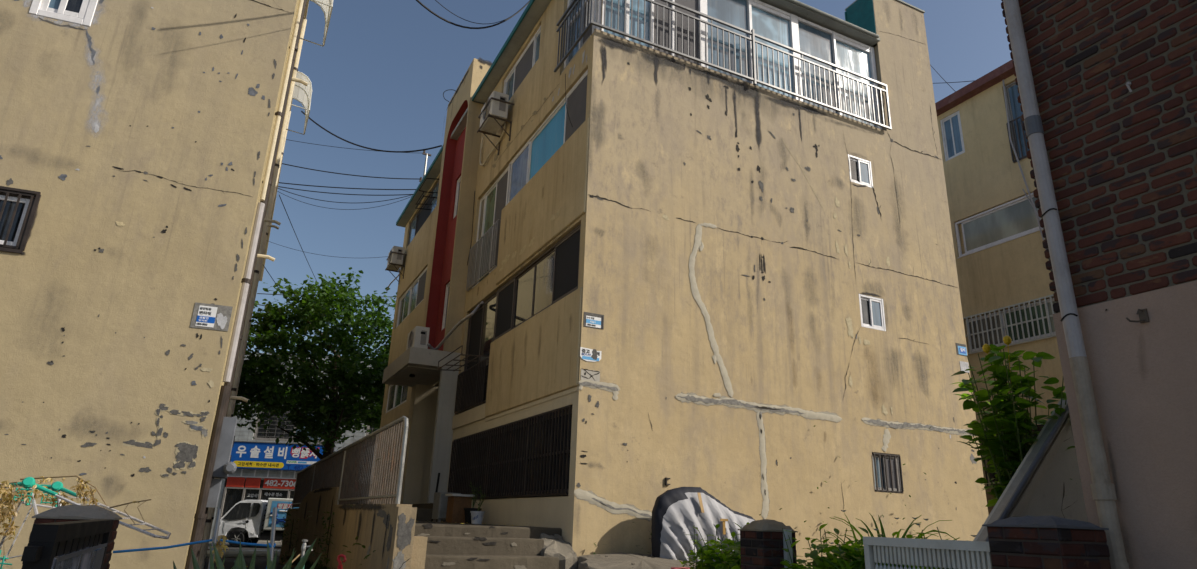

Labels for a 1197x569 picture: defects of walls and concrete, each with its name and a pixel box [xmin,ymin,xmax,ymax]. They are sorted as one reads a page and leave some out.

peeling [248,59,277,116]
leakage [600,38,825,147]
crack [112,166,252,197]
crack [590,91,973,519]
peeling [77,333,214,477]
crack [579,380,620,400]
crack [574,488,652,521]
flaking render [377,509,441,569]